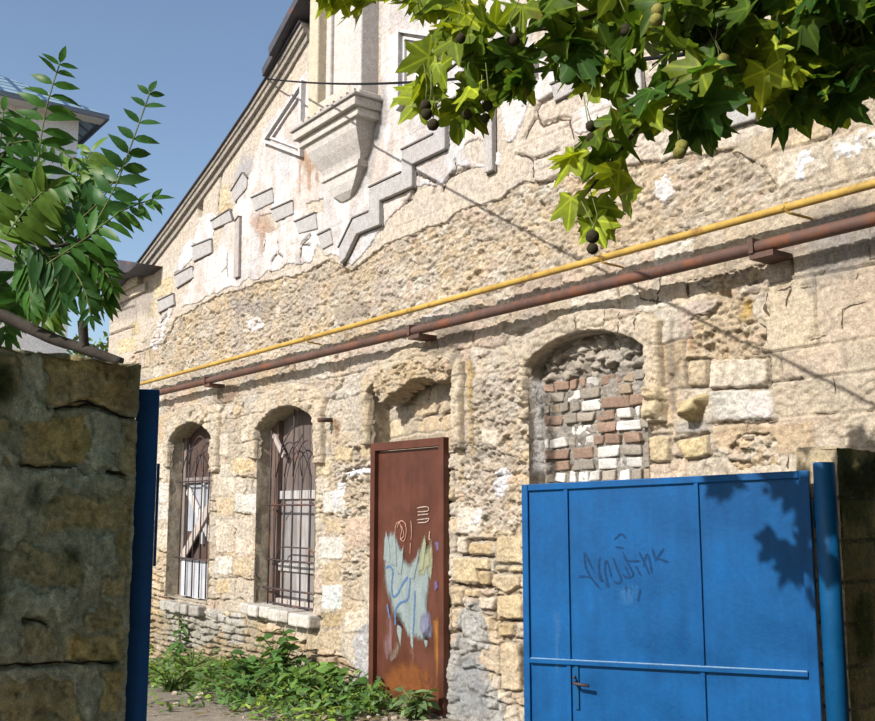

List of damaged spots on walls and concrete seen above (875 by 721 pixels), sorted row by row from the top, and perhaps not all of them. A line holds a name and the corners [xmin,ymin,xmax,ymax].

peeling [835,128,875,160]
peeling [795,150,814,181]
spalling [149,0,778,381]
crack [54,400,135,419]
crack [0,659,115,667]